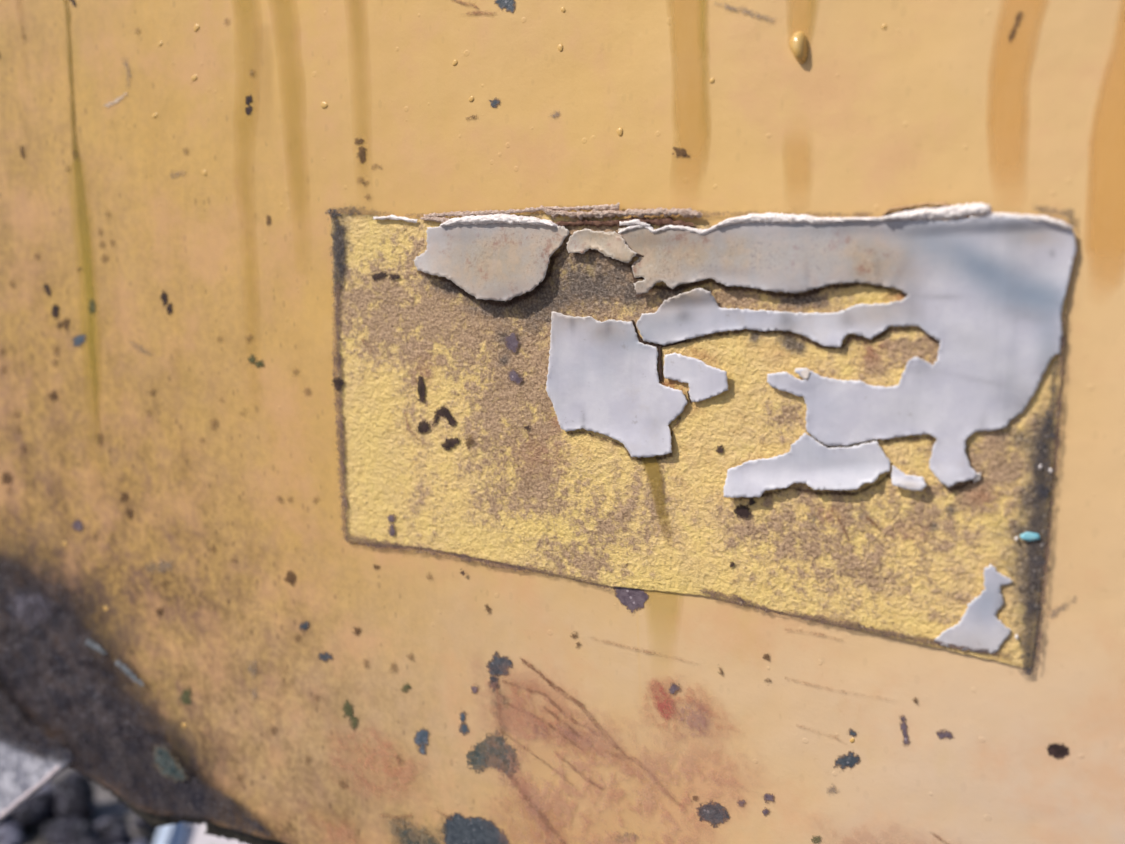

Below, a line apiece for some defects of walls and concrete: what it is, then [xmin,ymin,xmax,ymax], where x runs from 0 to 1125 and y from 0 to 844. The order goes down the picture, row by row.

damp [790,0,810,64]
damp [1093,20,1125,251]
spalling [372,271,400,281]
peeling [414,202,1077,518]
spalling [387,514,397,536]
peeling [614,587,650,613]
peeling [934,564,1013,654]